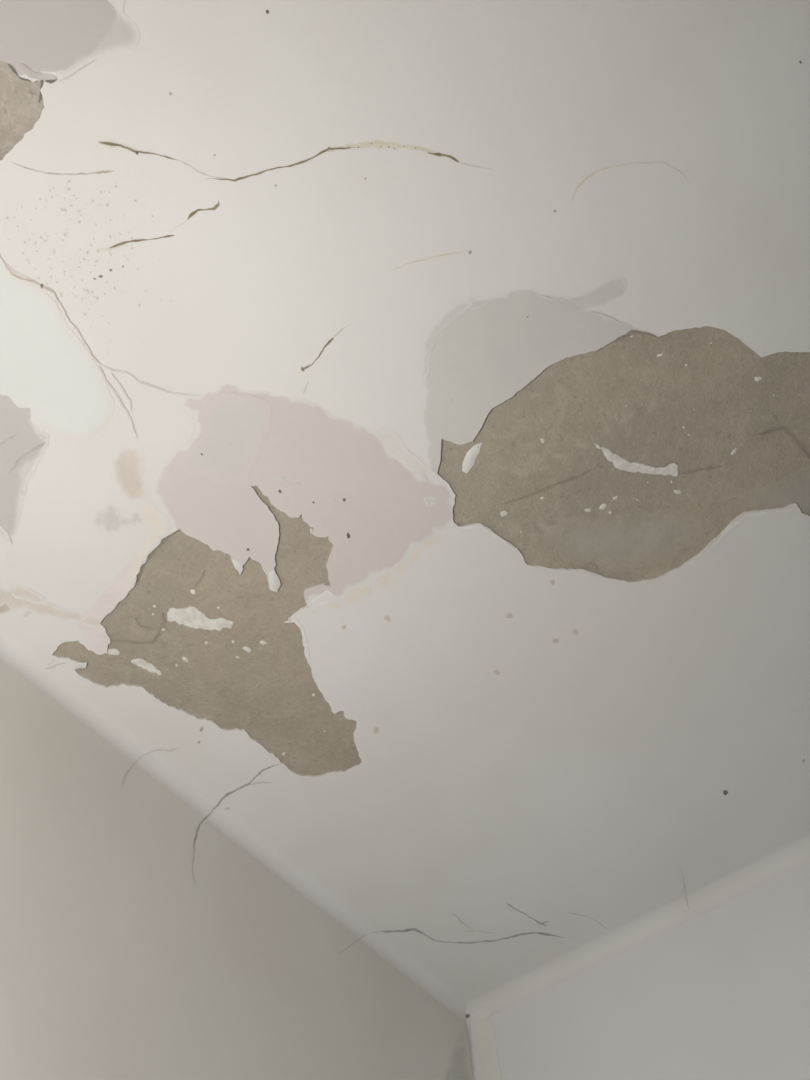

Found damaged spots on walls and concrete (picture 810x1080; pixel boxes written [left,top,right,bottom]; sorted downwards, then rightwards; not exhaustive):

spalling [0,60,57,160]
crack [12,138,493,280]
crack [0,256,201,439]
spalling [438,326,810,581]
spalling [53,477,361,776]
crack [192,764,278,884]
crack [339,903,607,954]